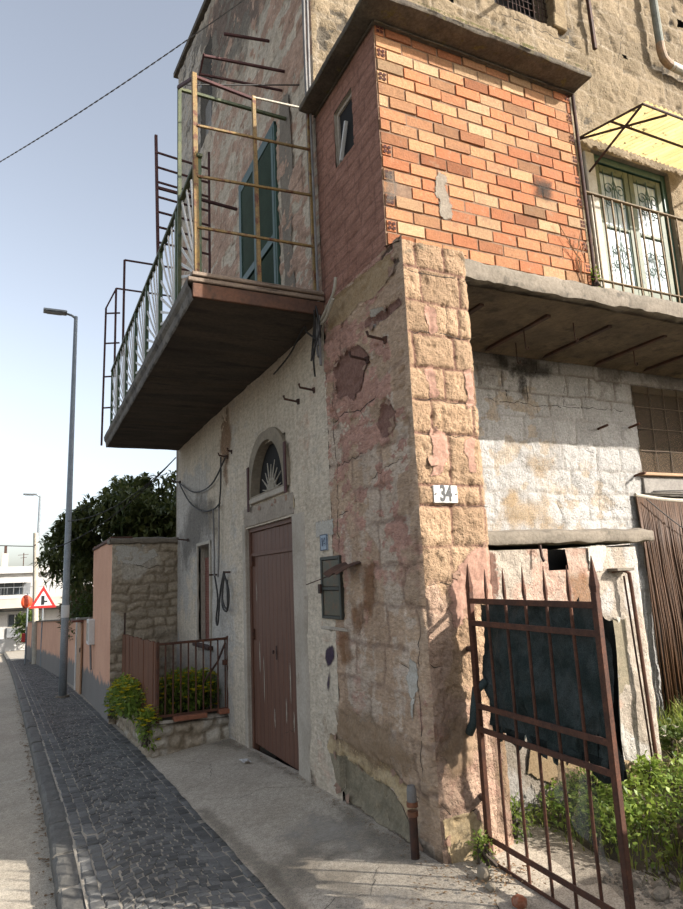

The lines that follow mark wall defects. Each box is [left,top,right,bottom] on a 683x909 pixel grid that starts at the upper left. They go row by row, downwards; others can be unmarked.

spalling [333,345,368,400]
water stain [496,356,549,394]
spalling [377,399,396,438]